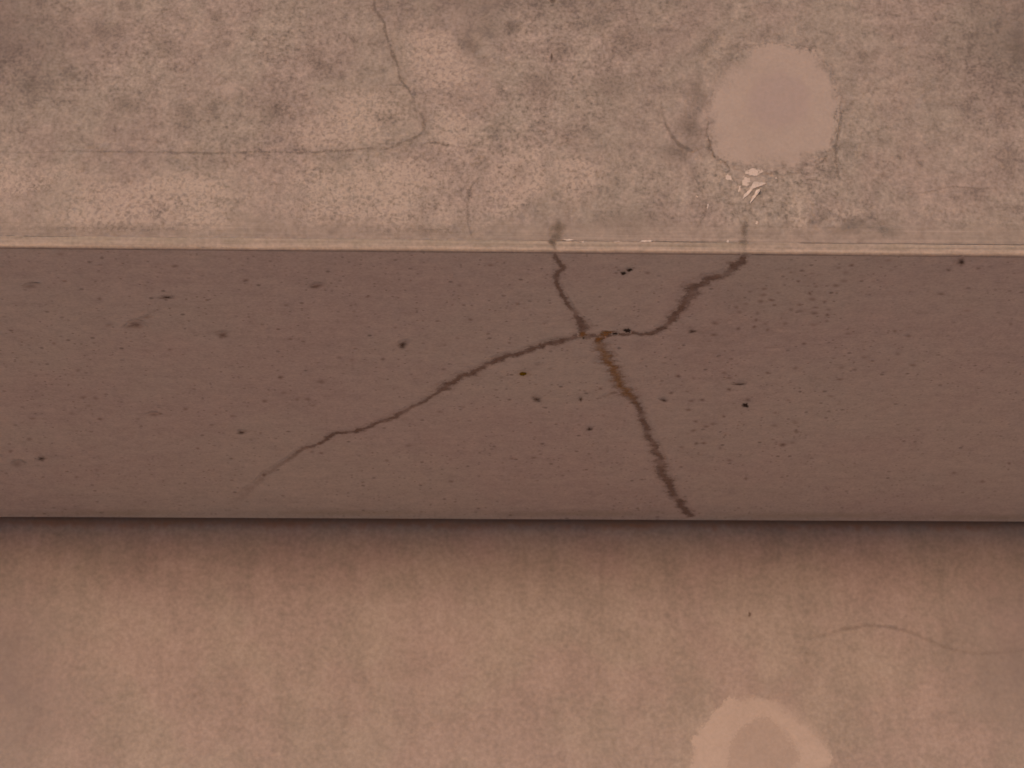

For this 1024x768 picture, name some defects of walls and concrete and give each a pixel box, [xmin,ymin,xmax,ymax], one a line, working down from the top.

spalling [725,168,777,204]
crack [229,253,752,518]